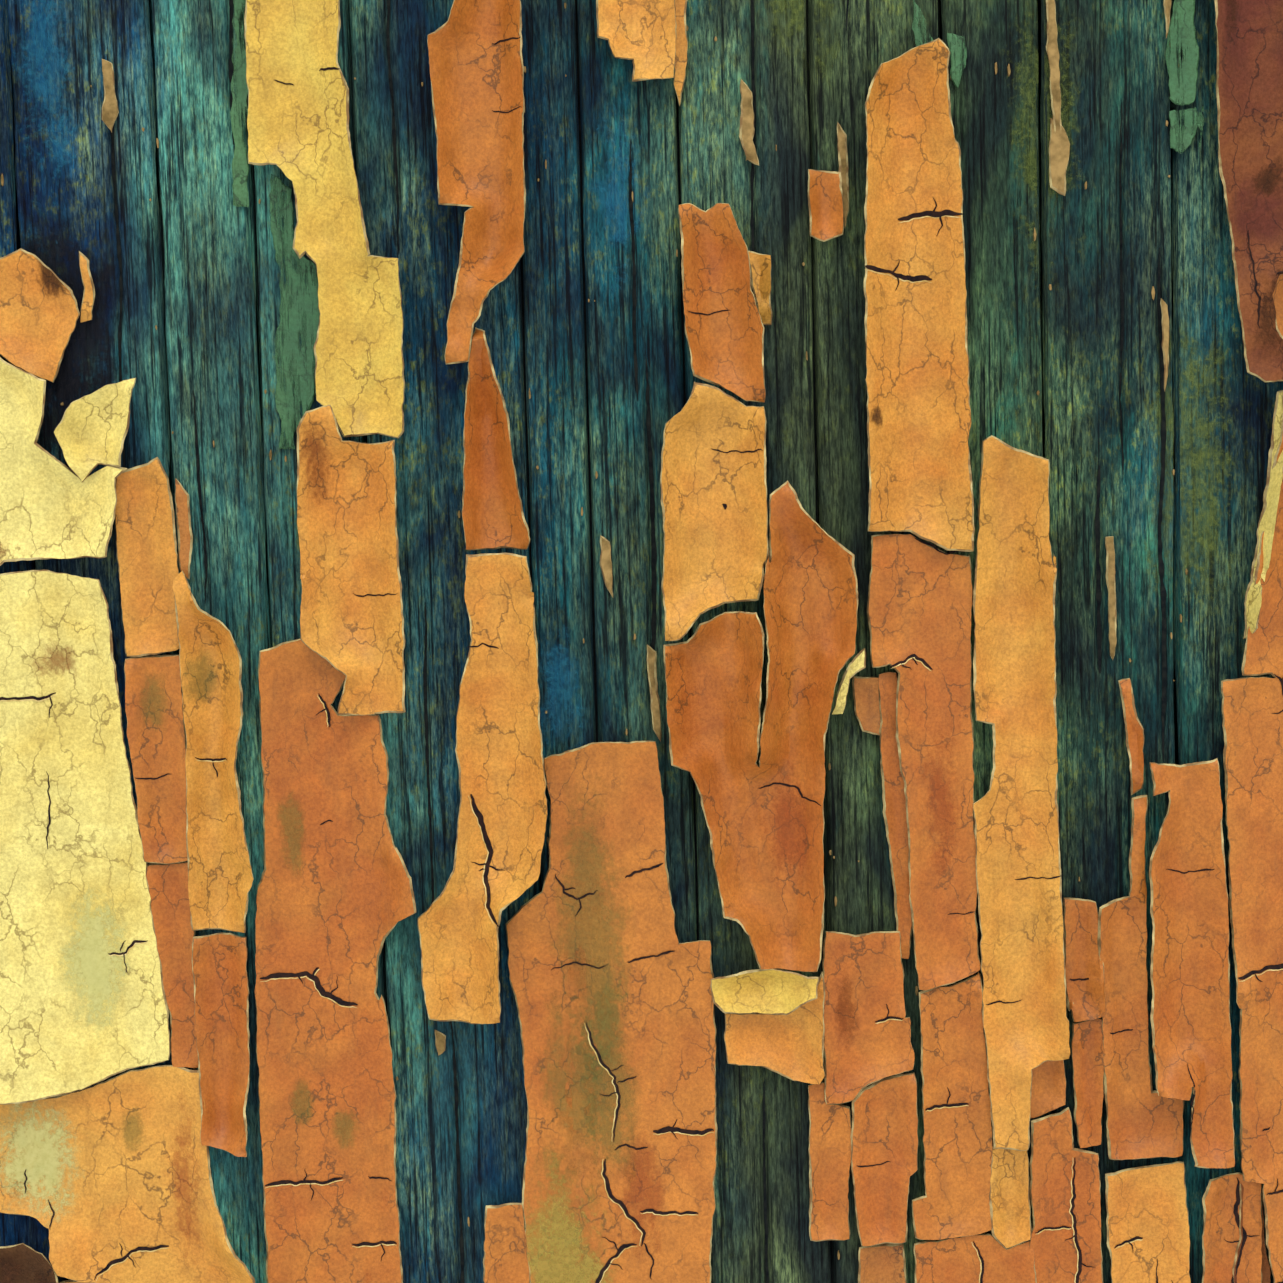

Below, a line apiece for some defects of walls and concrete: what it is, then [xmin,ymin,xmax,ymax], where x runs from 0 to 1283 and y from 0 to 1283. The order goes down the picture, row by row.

crack [898,198,963,235]
crack [865,260,932,291]
peeling [0,0,416,1283]
peeling [417,0,1283,1283]
crack [1272,674,1283,714]
crack [468,794,505,928]
crack [260,967,358,1008]
crack [1238,963,1283,982]
crack [584,1022,714,1283]